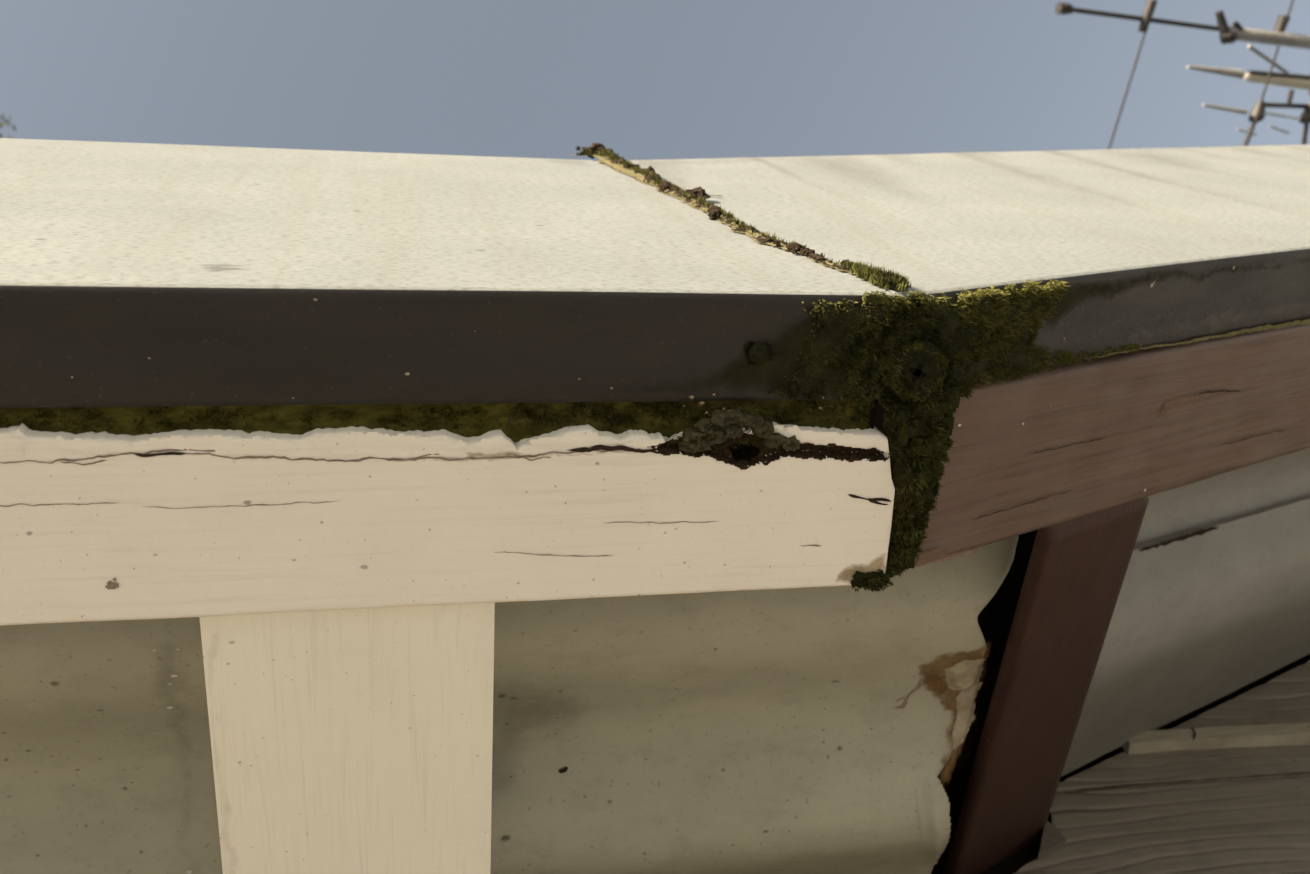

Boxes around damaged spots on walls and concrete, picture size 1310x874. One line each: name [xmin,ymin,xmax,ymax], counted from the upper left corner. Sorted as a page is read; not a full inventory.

peeling [54,436,131,454]
peeling [149,432,676,458]
peeling [773,425,888,448]
water stain [839,558,894,593]